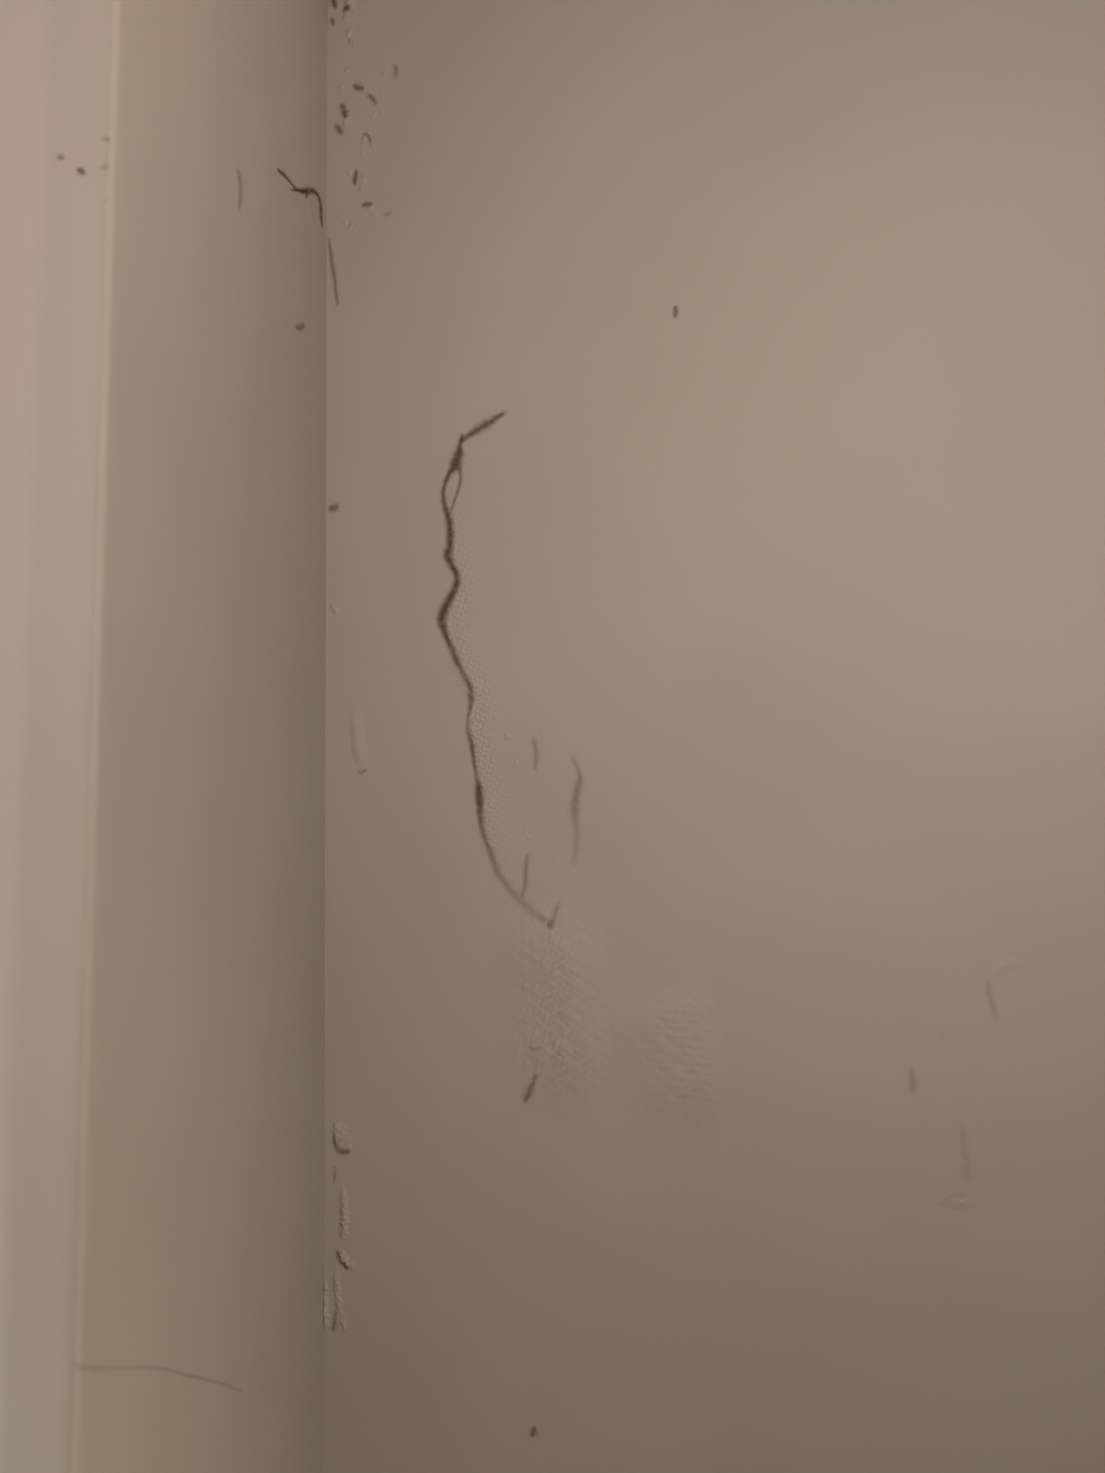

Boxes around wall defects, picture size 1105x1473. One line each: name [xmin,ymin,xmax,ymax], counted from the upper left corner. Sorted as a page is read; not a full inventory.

crack [273,170,322,231]
crack [439,400,553,888]
peeling [323,1175,361,1342]